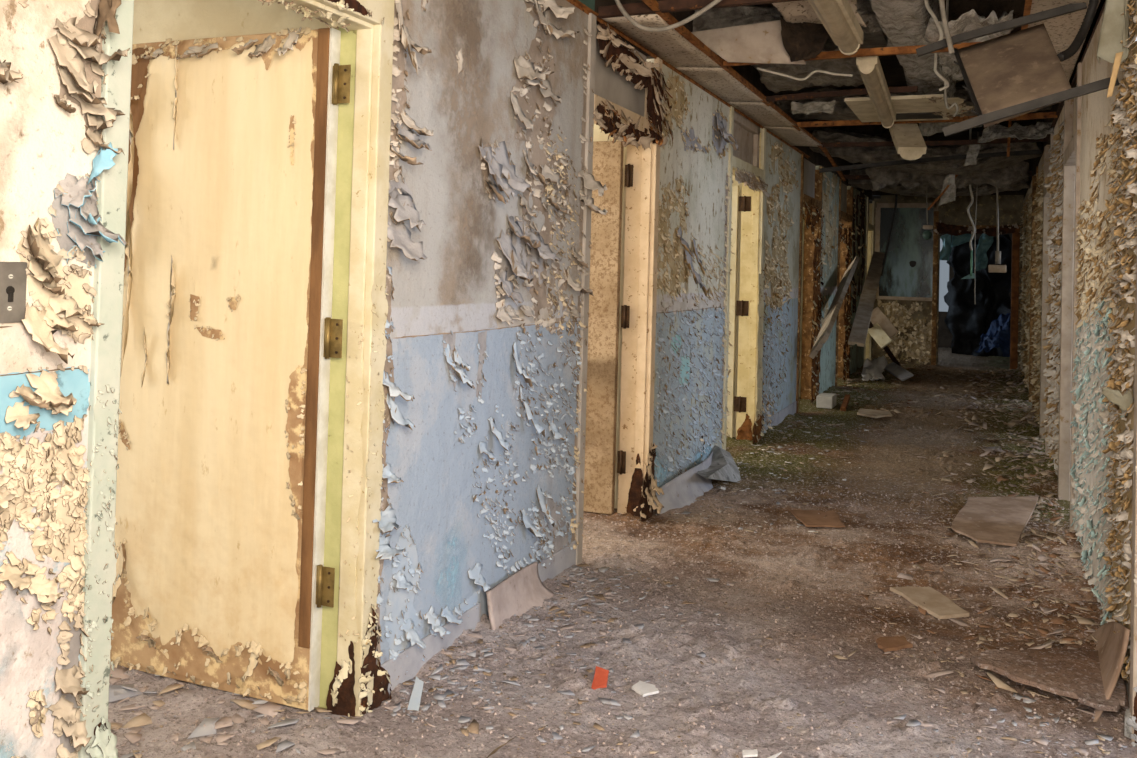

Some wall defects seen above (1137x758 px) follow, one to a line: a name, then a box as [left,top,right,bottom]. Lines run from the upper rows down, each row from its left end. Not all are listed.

crack [1,368,79,376]
peeling [339,0,739,712]
peeling [653,141,799,495]
corrosion [803,201,825,403]
peeling [877,299,939,365]
peeling [975,0,1137,683]
corrosion [326,604,392,717]
peeling [458,680,521,737]
corrosion [1127,687,1137,747]